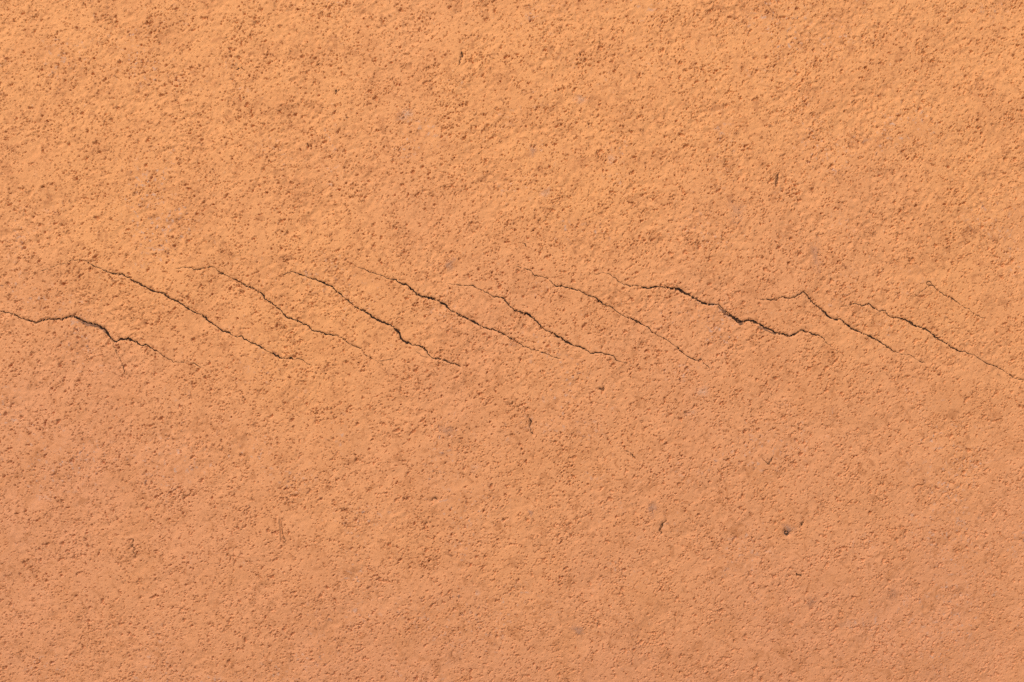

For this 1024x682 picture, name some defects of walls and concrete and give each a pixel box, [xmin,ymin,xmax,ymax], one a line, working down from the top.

crack [1,311,198,372]
crack [30,259,310,365]
crack [176,266,460,366]
crack [361,268,626,363]
crack [517,243,1023,380]